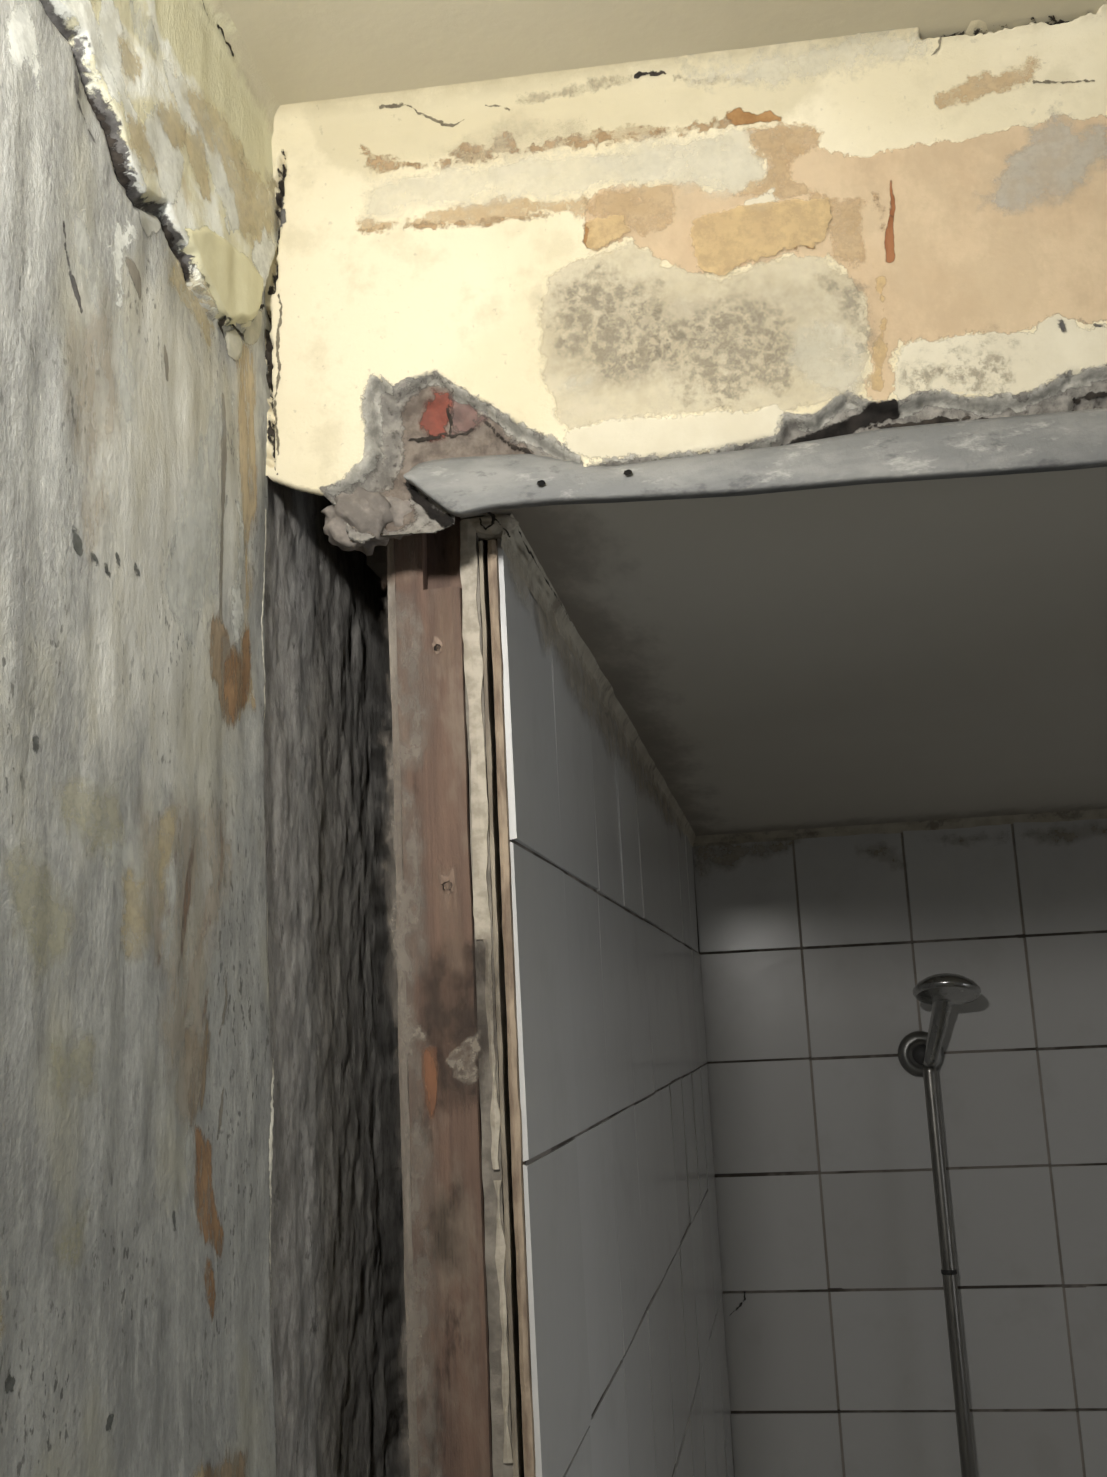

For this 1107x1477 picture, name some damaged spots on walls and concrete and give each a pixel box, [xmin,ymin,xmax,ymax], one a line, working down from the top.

peeling [6,4,42,91]
crack [39,0,195,282]
peeling [49,0,279,360]
crack [265,149,287,475]
crack [379,103,510,127]
leakage [540,241,869,431]
corrosion [874,180,895,263]
peeling [935,60,1095,109]
crack [944,12,1089,37]
peeling [319,114,1107,1463]